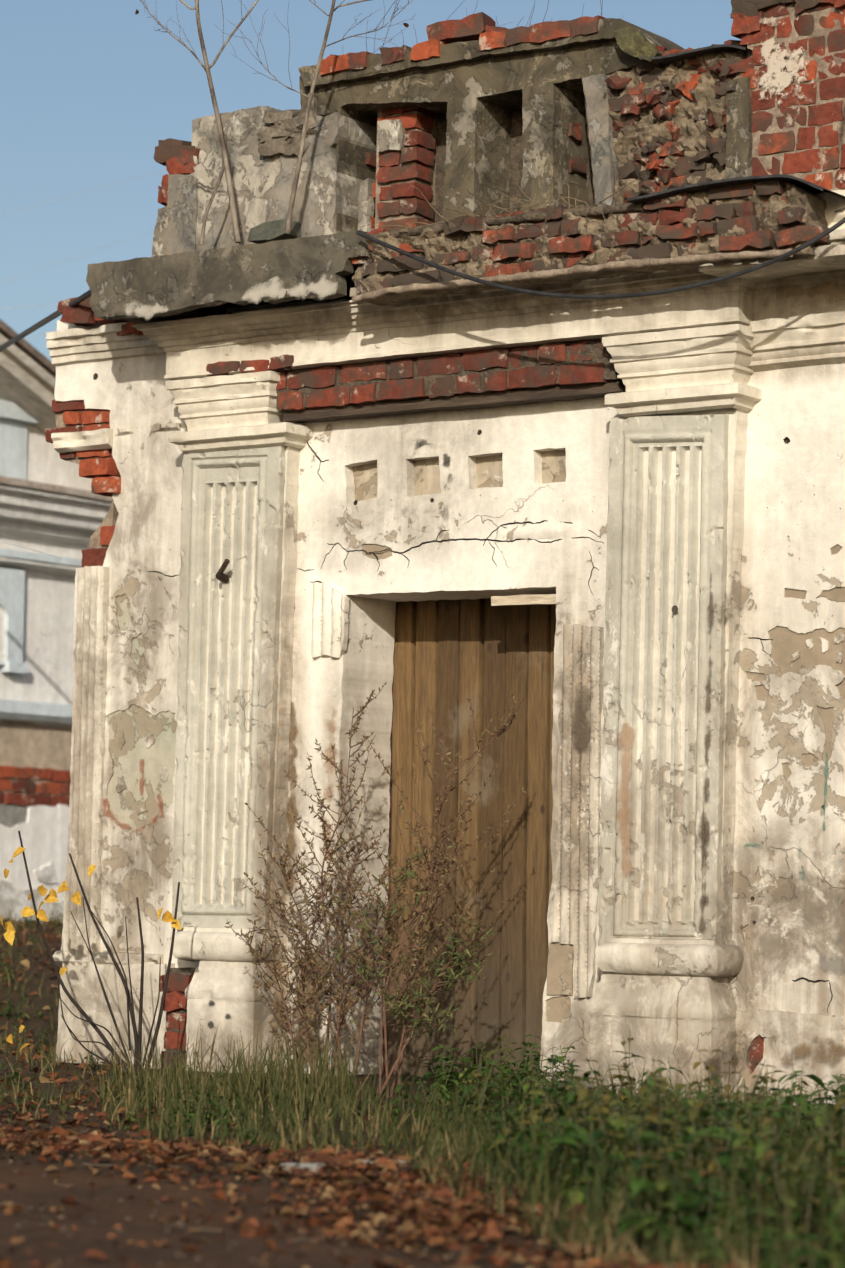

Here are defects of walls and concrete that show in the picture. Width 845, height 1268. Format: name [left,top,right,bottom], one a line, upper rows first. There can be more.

spalling [154,138,200,206]
crack [299,520,603,596]
peeling [785,587,845,602]
peeling [746,671,769,701]
peeling [769,626,845,780]
spalling [0,721,72,828]
peeling [107,704,177,833]
peeling [0,862,64,925]
crack [792,977,833,1012]